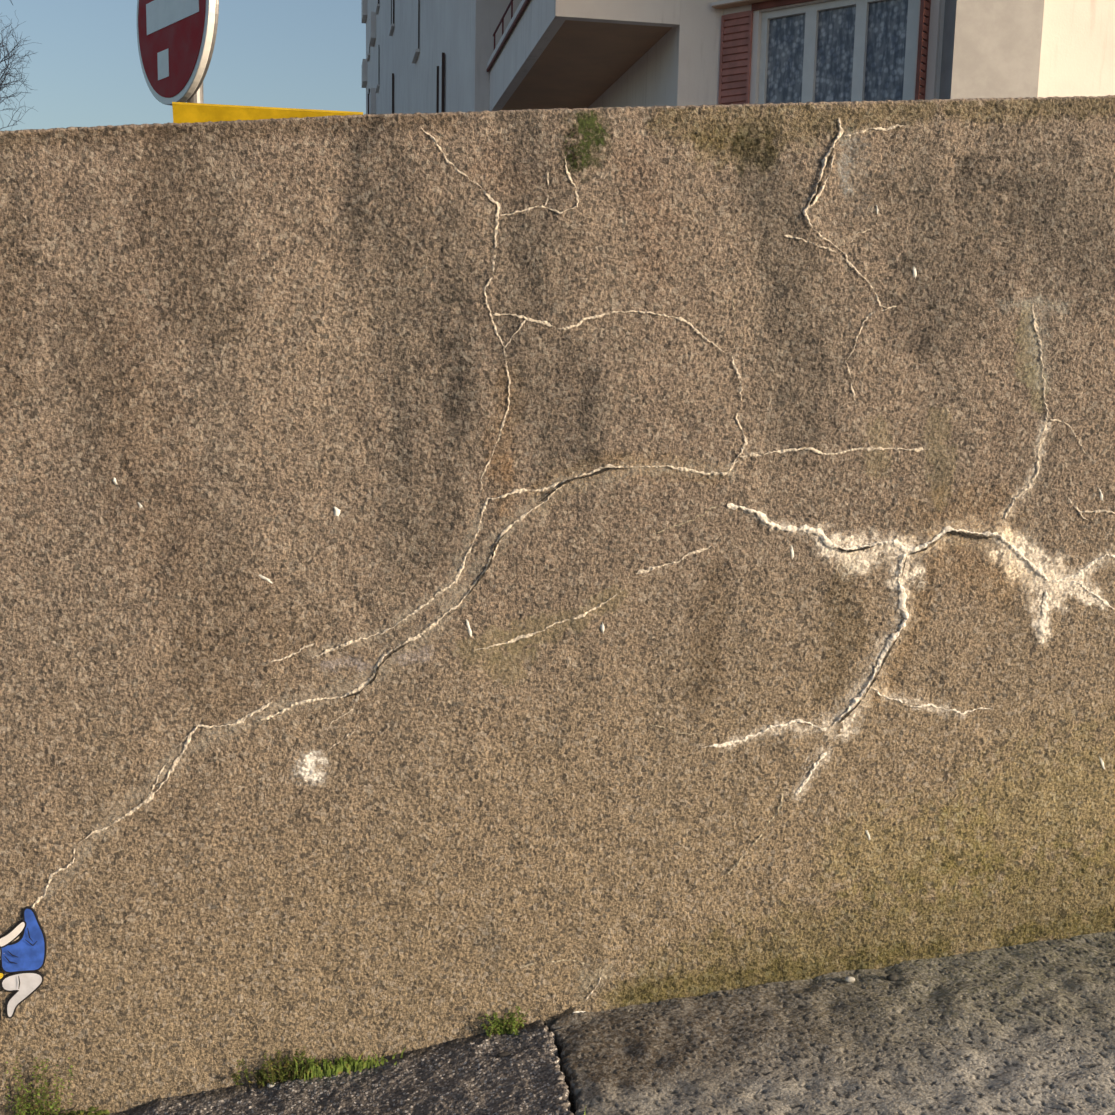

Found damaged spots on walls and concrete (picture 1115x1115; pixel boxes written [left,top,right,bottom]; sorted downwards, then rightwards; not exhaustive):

crack [31,119,930,909]
crack [473,303,1115,880]
leakage [730,421,1110,799]
crack [491,959,603,1019]